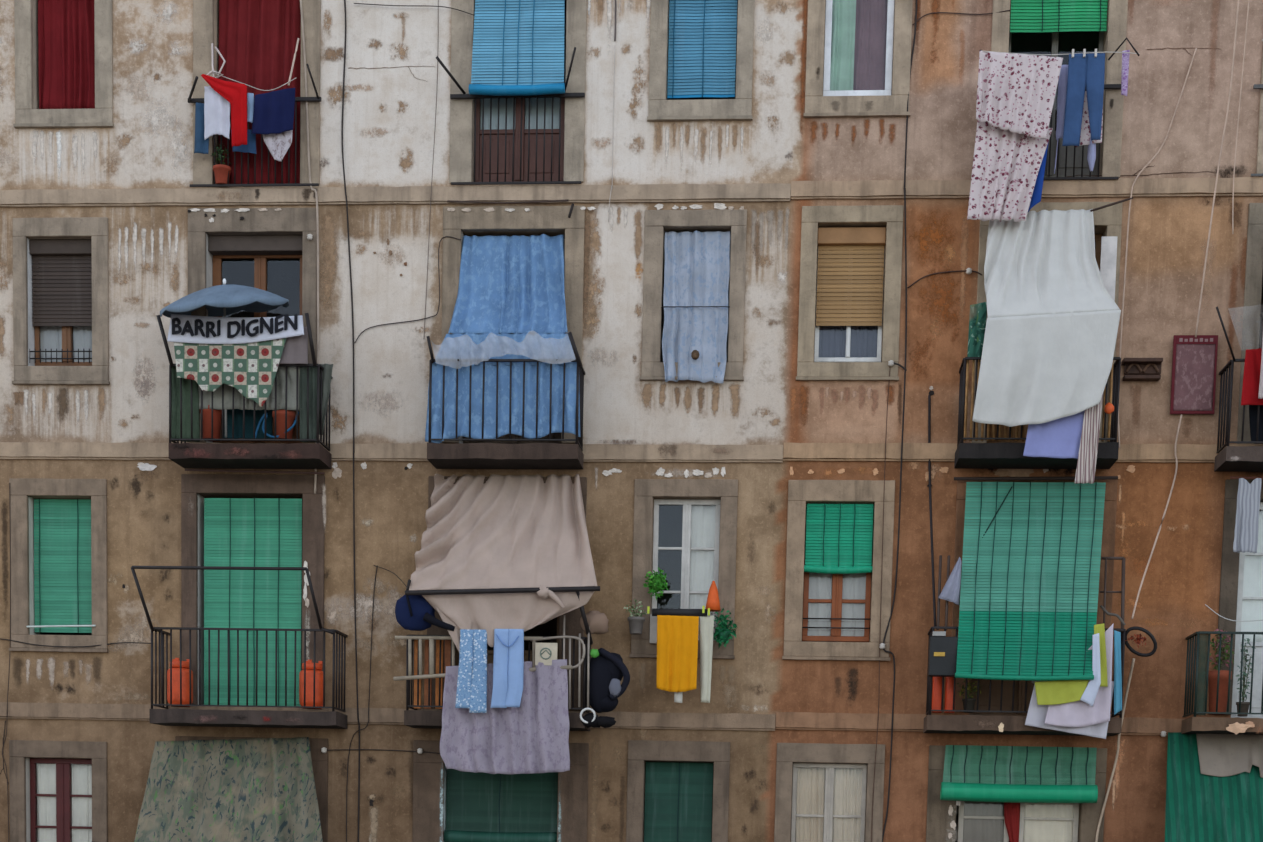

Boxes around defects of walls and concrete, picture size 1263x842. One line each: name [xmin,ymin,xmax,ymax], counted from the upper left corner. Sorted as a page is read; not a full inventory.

peeling [588,0,612,33]
peeling [369,13,407,59]
peeling [325,48,344,61]
peeling [328,85,370,104]
peeling [629,63,645,118]
water stain [656,123,743,165]
peeling [399,150,413,172]
water stain [642,384,740,416]
water stain [26,658,91,692]